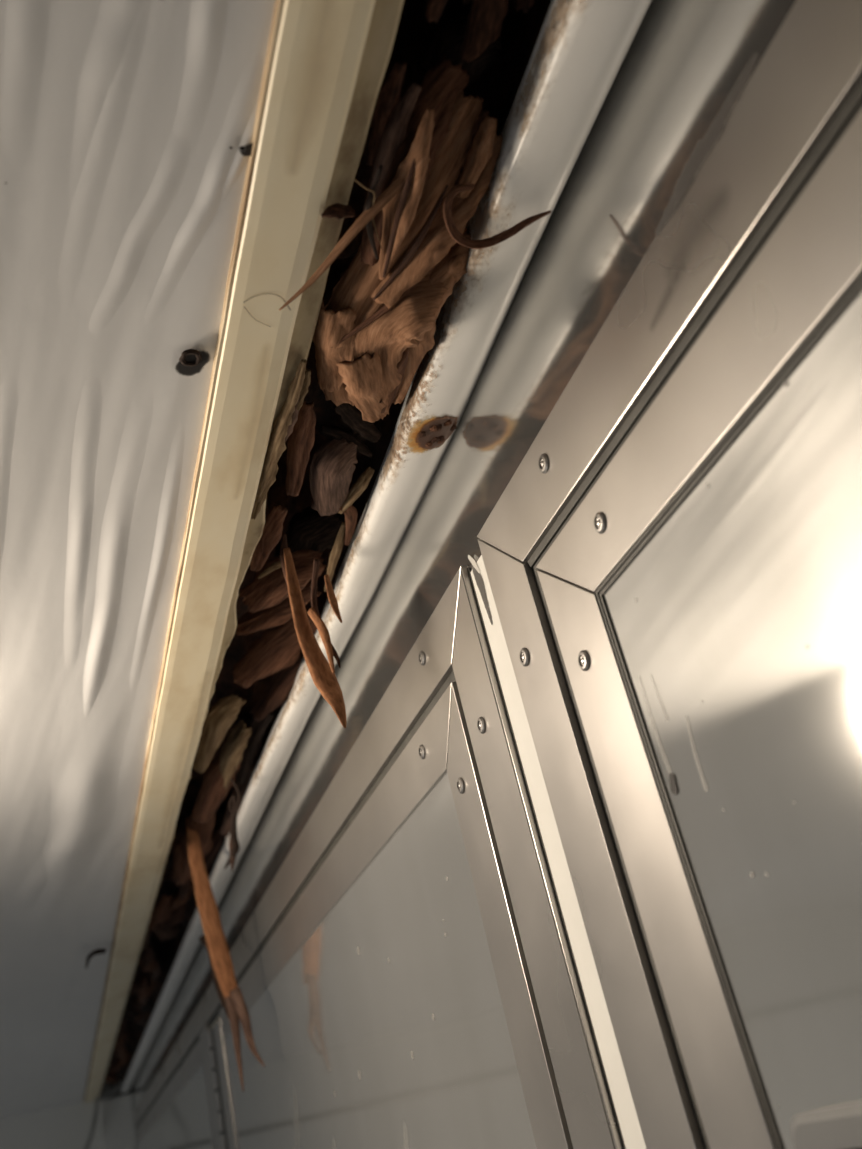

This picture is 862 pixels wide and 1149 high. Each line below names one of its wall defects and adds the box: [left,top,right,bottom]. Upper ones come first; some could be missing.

peeling [172,54,503,885]
rust [383,187,502,476]